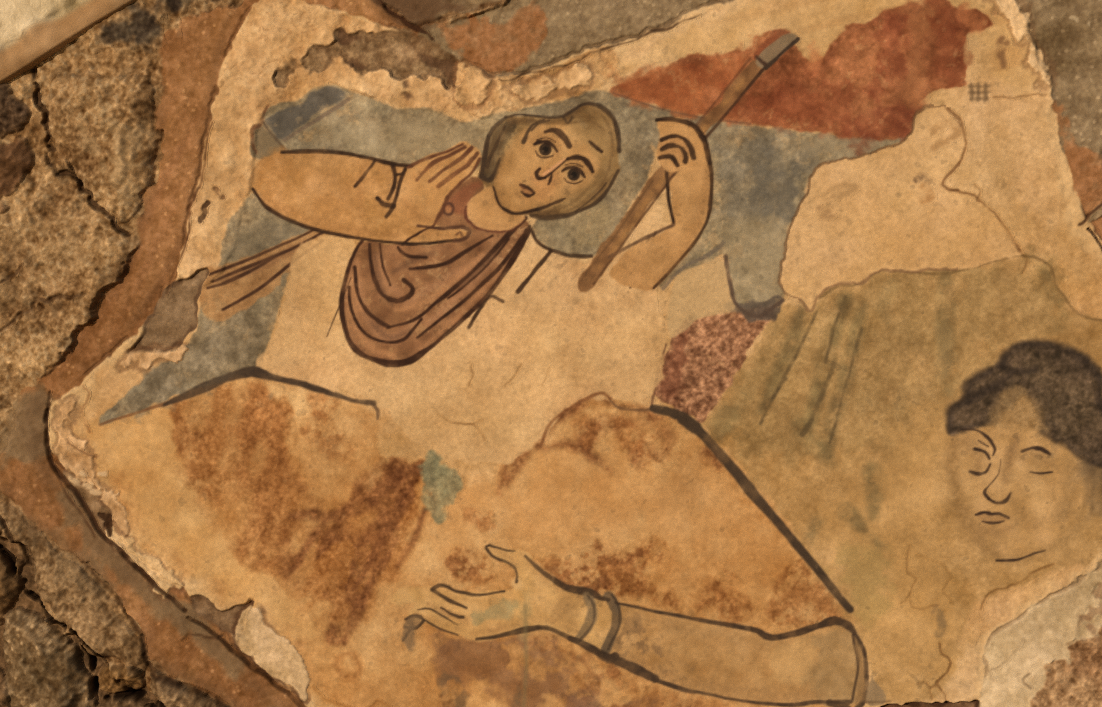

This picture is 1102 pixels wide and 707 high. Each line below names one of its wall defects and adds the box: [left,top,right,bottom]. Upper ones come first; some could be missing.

crack [29,66,131,238]
flaking render [512,64,594,102]
flaking render [54,399,184,600]
flaking render [192,595,310,701]